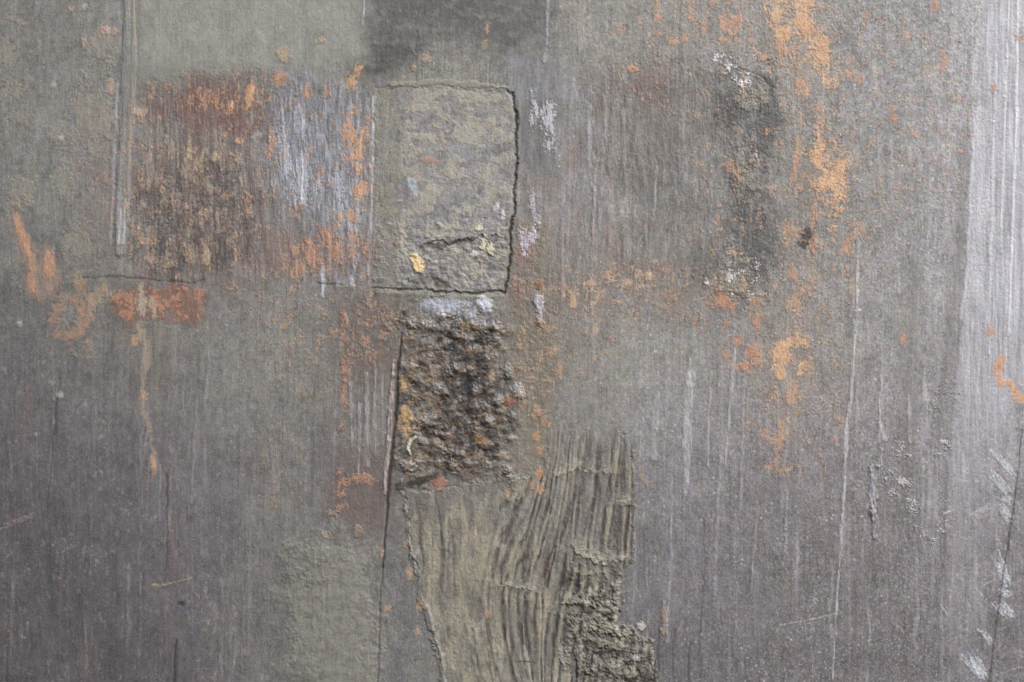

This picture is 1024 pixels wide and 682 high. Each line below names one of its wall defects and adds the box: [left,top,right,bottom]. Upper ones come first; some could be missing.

crack [81,274,207,285]
corrosion [1,43,417,581]
spalling [0,12,525,510]
crack [315,30,520,296]
corrosion [498,0,1000,496]
crack [376,332,402,682]
spalling [539,550,668,682]